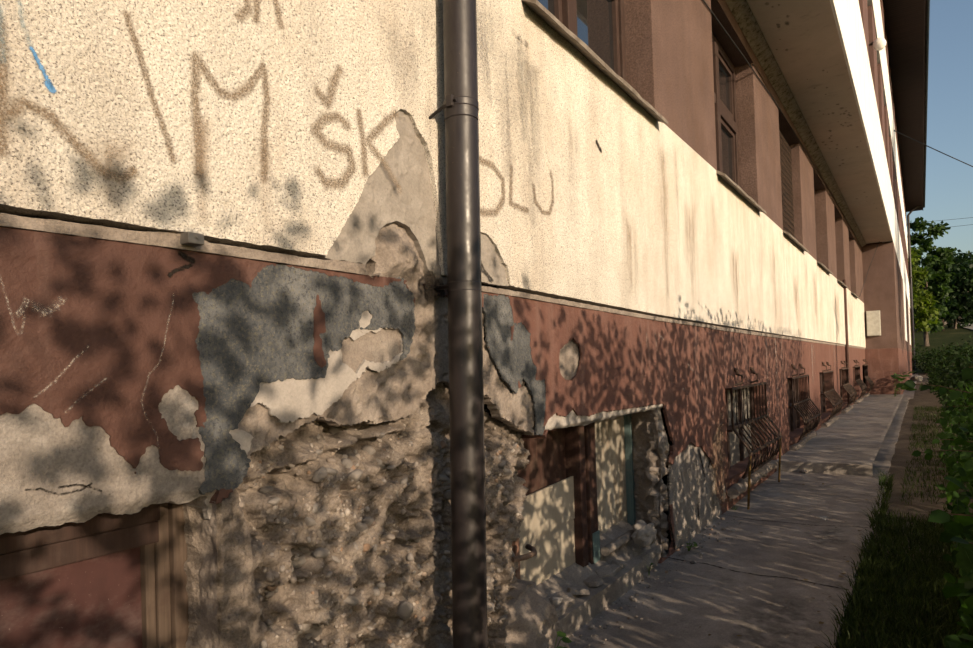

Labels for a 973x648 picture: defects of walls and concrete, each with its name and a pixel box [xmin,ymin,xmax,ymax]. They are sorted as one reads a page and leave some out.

spalling [0,263,453,648]
spalling [482,294,668,648]
spalling [667,443,732,551]